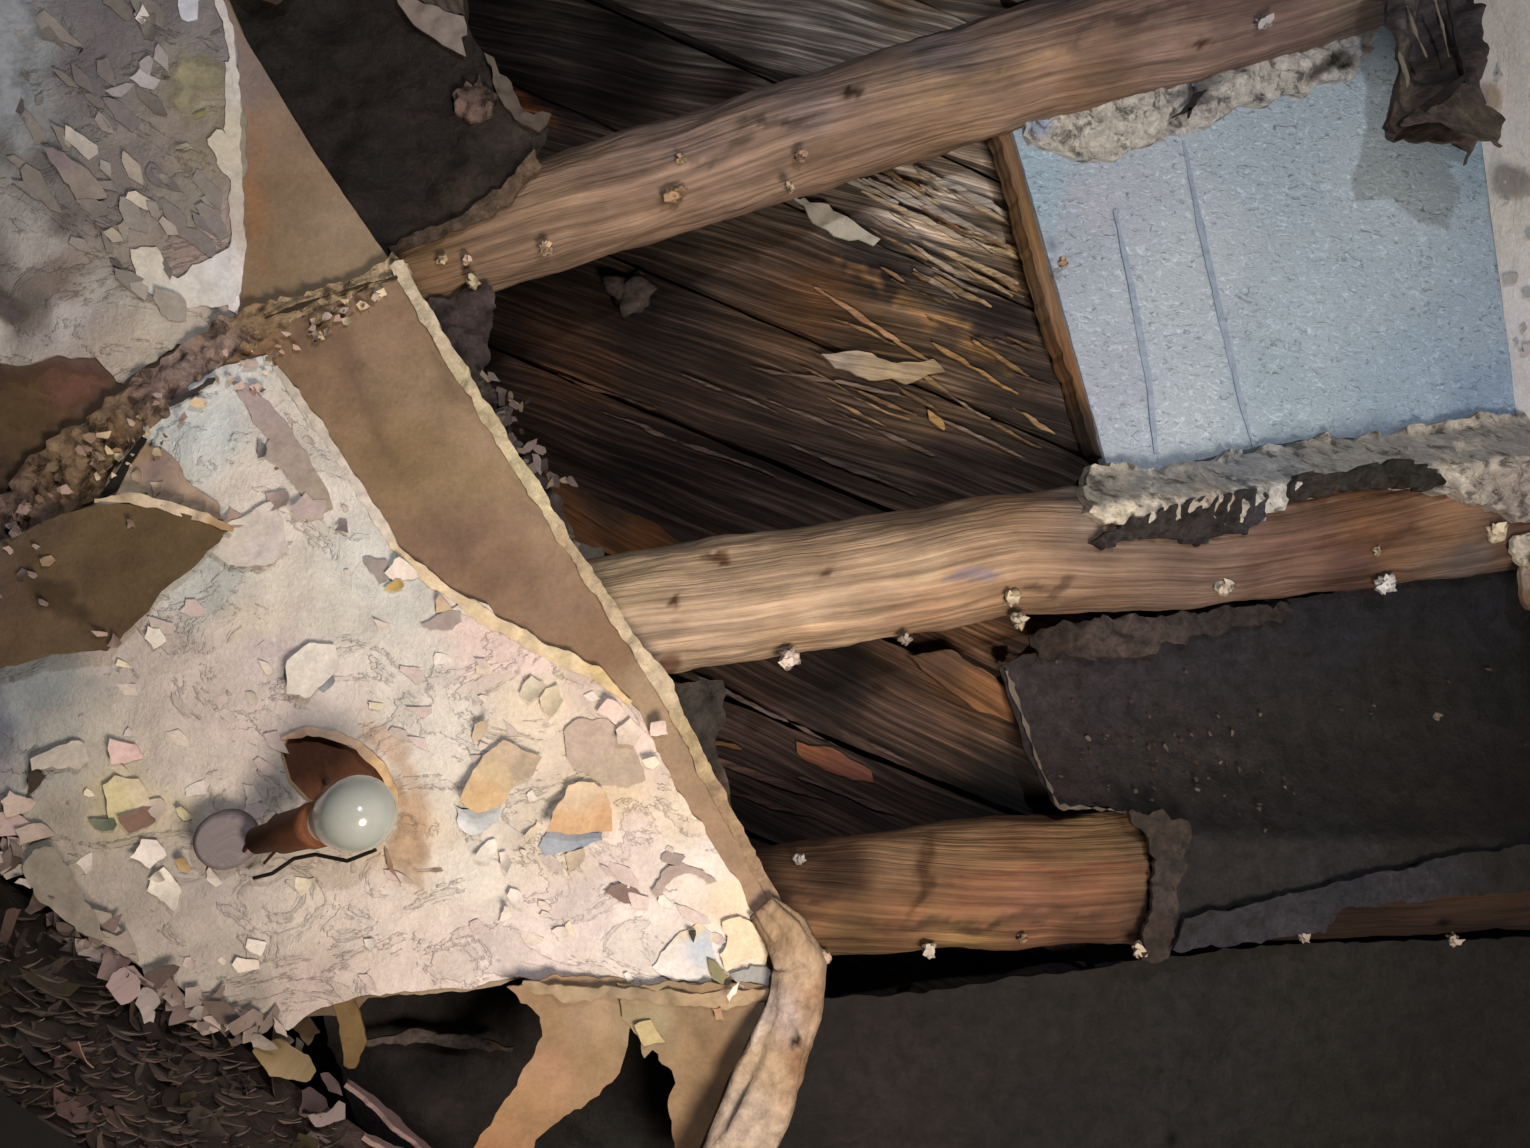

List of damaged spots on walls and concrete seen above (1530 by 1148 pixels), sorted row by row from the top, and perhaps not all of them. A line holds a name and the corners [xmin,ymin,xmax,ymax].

spalling [1022,25,1385,163]
peeling [7,0,247,322]
peeling [786,181,880,246]
peeling [477,370,578,489]
spalling [1076,411,1530,535]
peeling [0,381,349,698]
peeling [344,556,418,591]
peeling [1375,574,1396,595]
peeling [778,656,794,669]
peeling [454,658,773,989]
peeling [0,727,349,1148]
peeling [923,943,935,957]